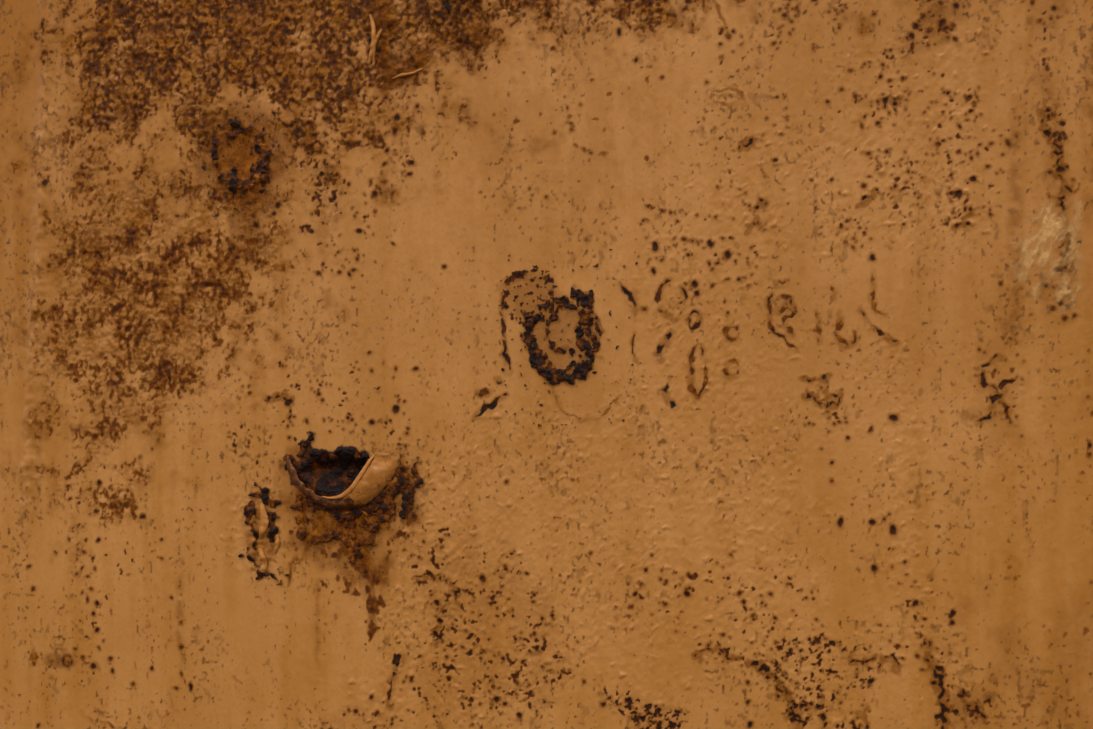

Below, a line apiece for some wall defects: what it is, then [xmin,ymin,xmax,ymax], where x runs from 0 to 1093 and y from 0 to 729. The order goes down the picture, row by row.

rust [586,0,705,32]
rust [28,0,567,528]
rust [496,253,619,427]
rust [767,281,797,348]
rust [835,321,857,348]
rust [802,373,847,433]
peeling [232,361,578,729]
spalling [601,689,686,729]